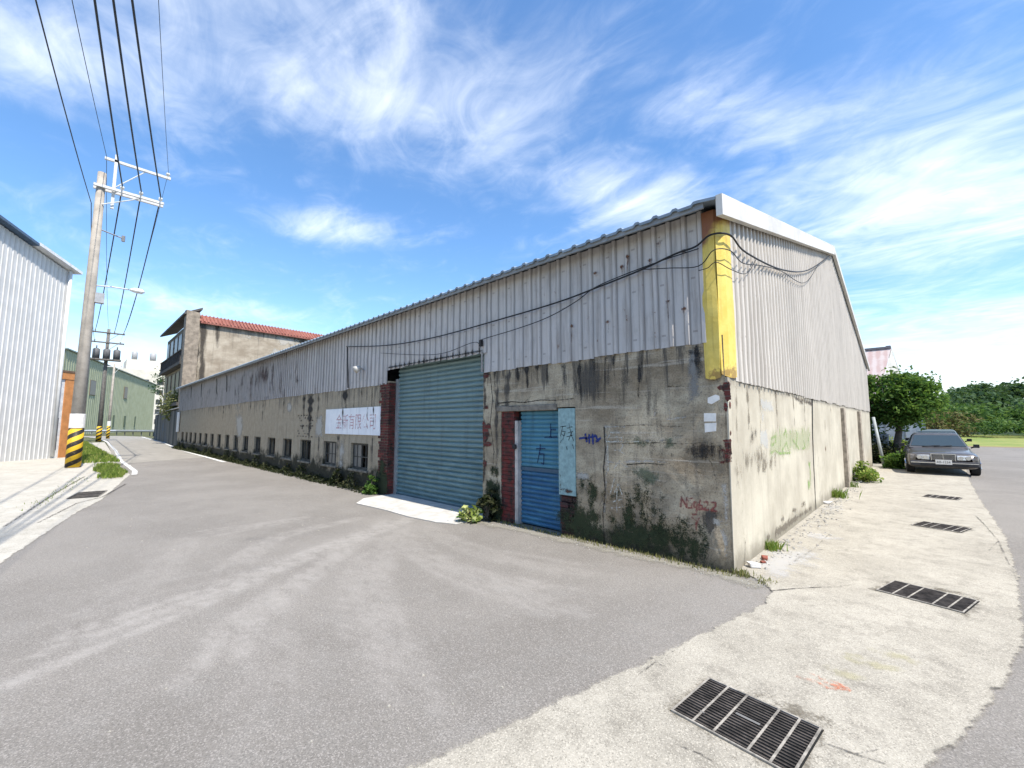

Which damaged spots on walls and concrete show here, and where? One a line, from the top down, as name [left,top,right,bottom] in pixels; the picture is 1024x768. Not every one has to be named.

water stain [302,394,319,457]
water stain [494,364,548,457]
water stain [561,355,657,422]
spalling [717,381,731,412]
water stain [688,444,720,458]
spalling [719,431,732,463]
water stain [702,511,716,534]